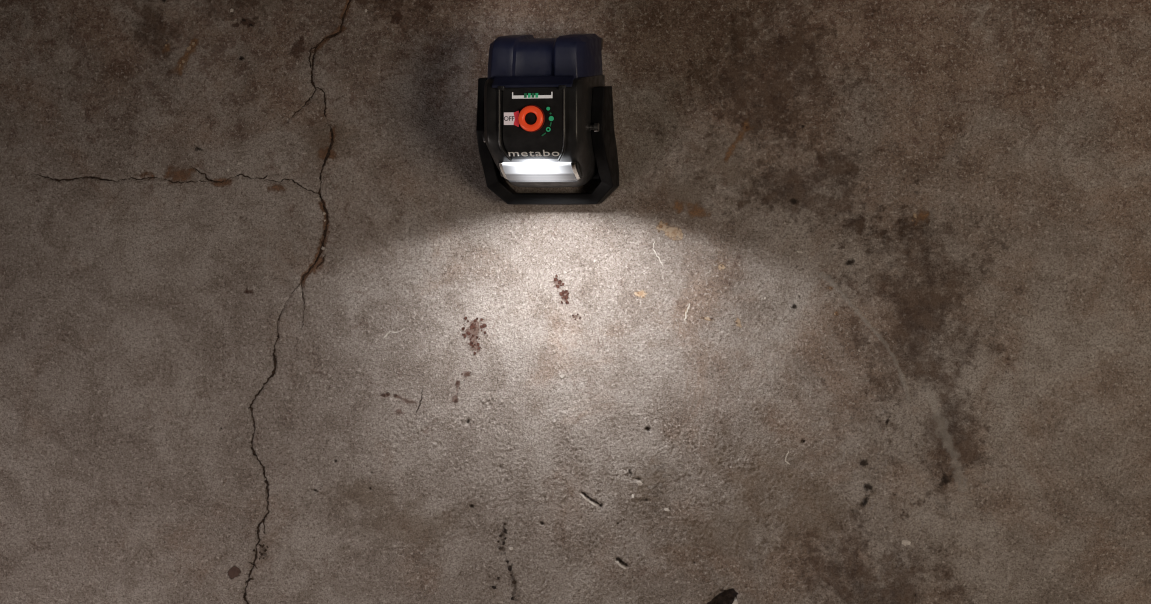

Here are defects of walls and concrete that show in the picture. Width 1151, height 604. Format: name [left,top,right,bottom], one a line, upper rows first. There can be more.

crack [36,0,351,604]